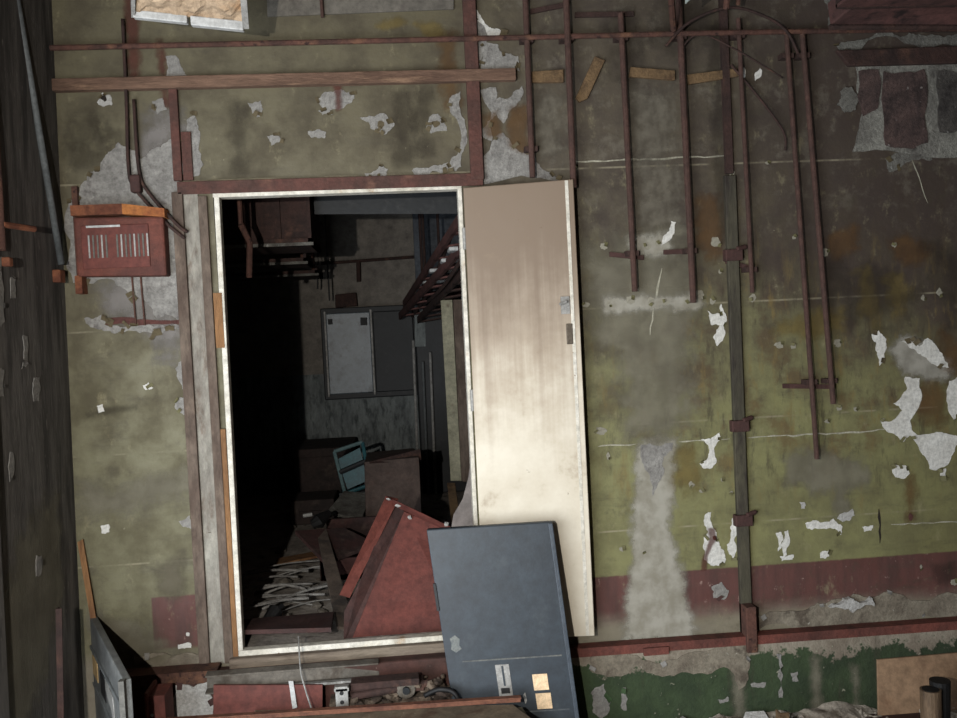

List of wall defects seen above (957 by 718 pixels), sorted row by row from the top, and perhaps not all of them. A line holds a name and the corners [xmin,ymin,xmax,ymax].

flaking render [476,10,521,73]
flaking render [412,92,467,175]
flaking render [480,86,562,185]
damp [533,96,560,156]
flaking render [64,111,204,340]
peeling [684,290,727,346]
damp [580,88,703,640]
peeling [872,330,957,482]
peeling [699,433,721,469]
peeling [703,512,737,568]
flaking render [755,578,957,630]
flaking render [173,682,213,717]